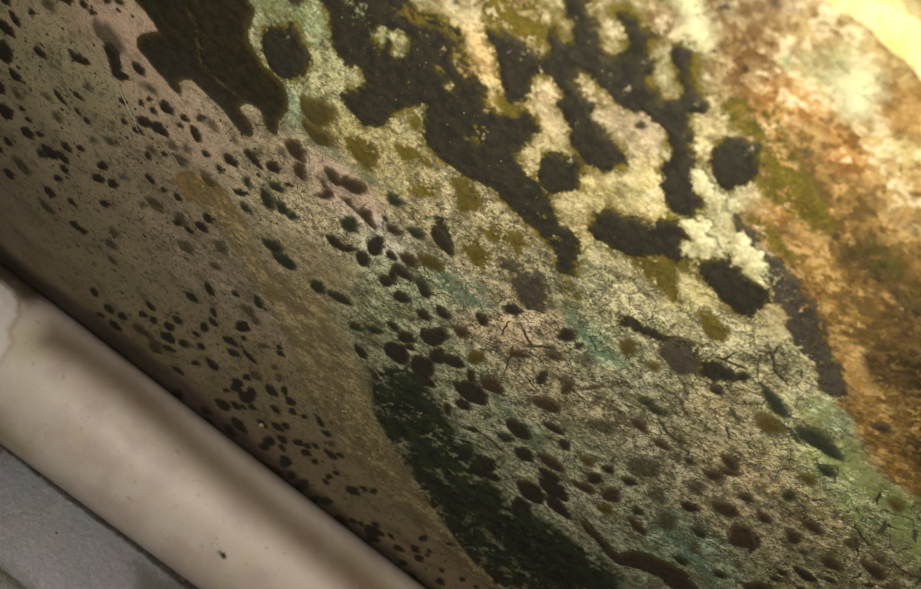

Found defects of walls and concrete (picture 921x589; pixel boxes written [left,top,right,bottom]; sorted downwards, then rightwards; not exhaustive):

leakage [887,99,921,143]
leakage [299,0,870,402]
leakage [755,387,845,485]
leakage [868,423,892,434]
leakage [680,453,742,512]
leakage [710,493,760,554]
leakage [757,512,773,524]
leakage [781,489,797,501]
leakage [887,498,905,513]
leakage [712,562,742,579]
leakage [742,517,844,589]
leakage [860,557,899,589]